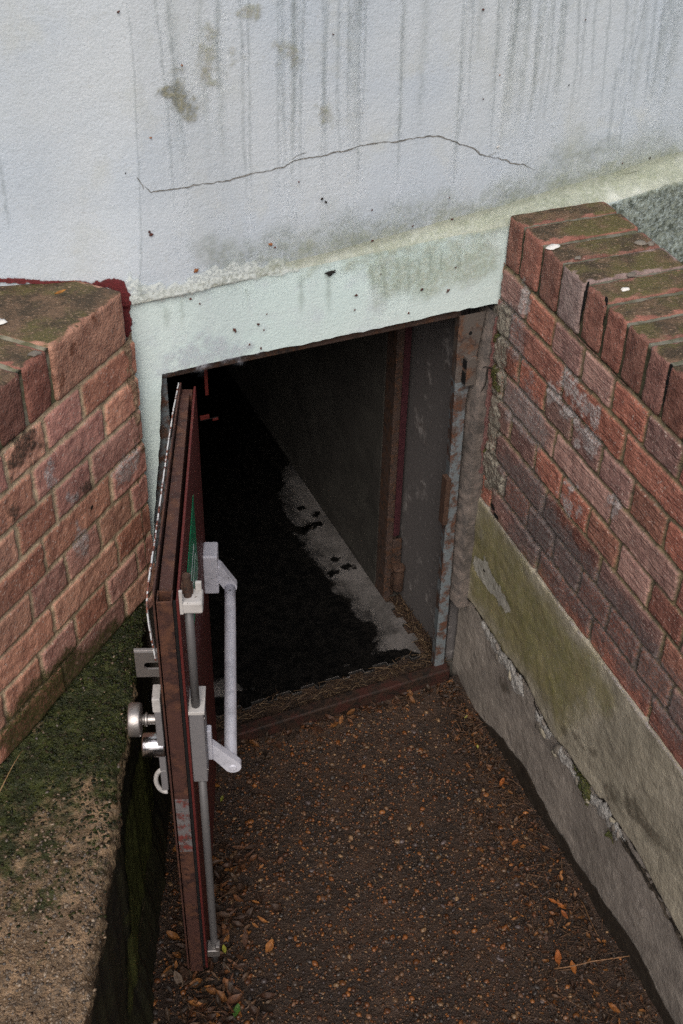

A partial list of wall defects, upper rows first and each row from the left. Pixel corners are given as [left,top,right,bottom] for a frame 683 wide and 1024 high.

leakage [158,82,196,120]
crack [137,135,532,193]
leakage [494,456,683,744]
crack [468,599,679,933]